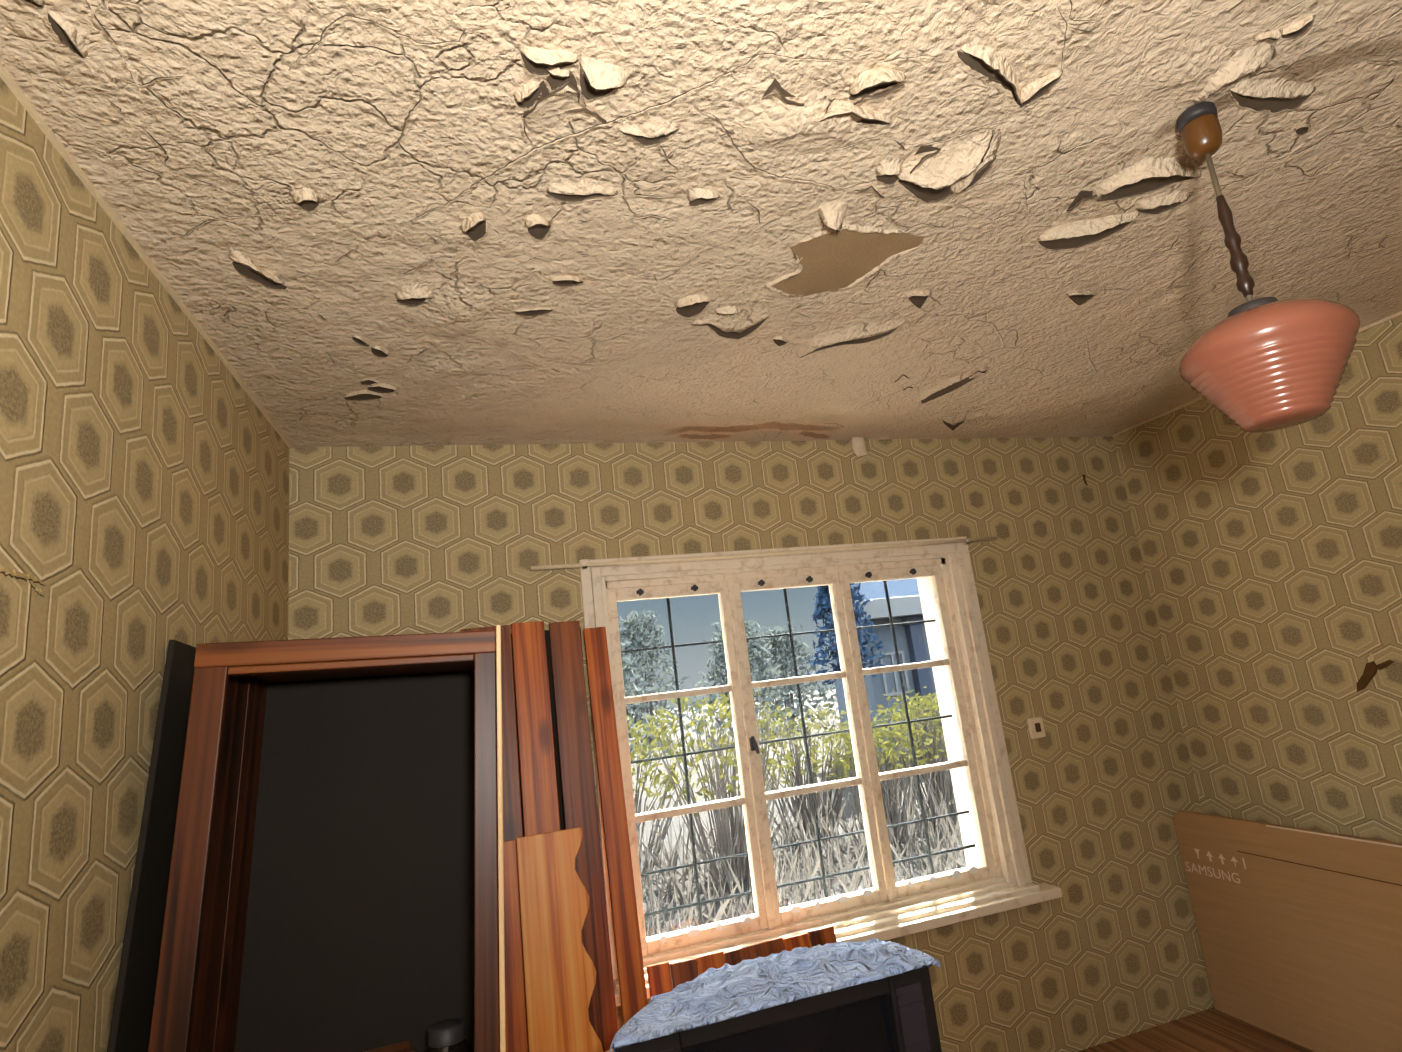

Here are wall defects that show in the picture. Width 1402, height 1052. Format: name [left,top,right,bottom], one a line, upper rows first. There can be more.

crack [288,7,488,71]
crack [1055,0,1109,71]
peeling [513,46,680,149]
crack [336,51,878,282]
peeling [819,68,907,129]
crack [833,111,1018,151]
peeling [952,44,1063,111]
peeling [1194,14,1316,137]
spalling [765,128,1001,296]
peeling [1035,157,1201,251]
crack [400,318,431,356]
crack [737,285,900,355]